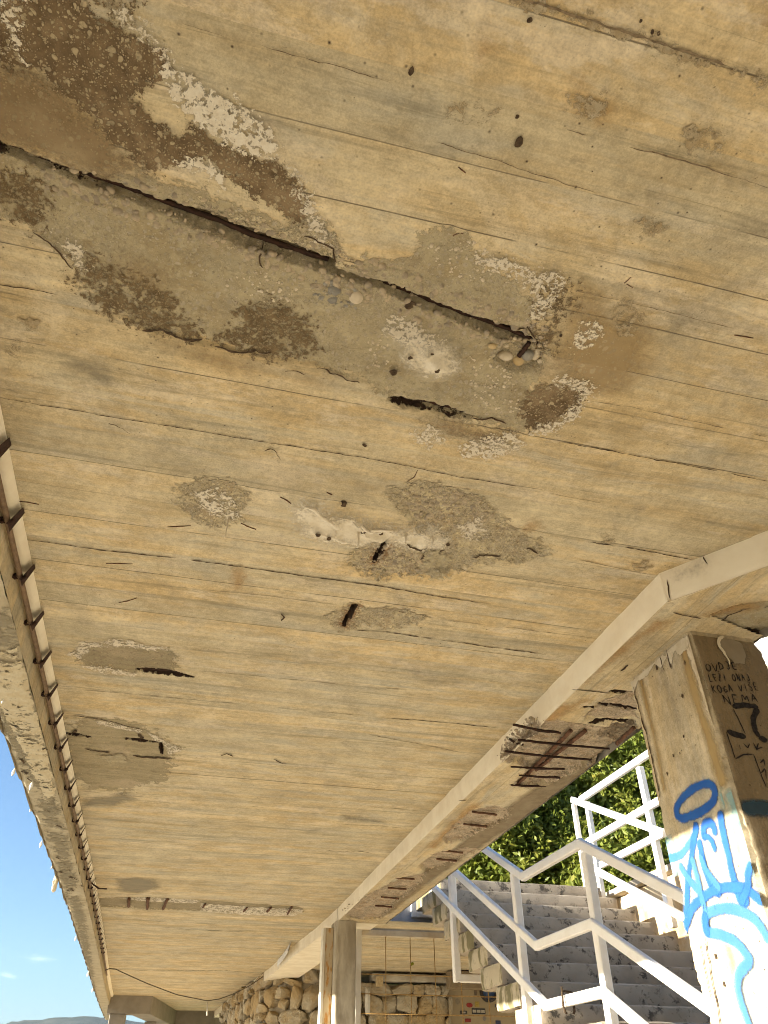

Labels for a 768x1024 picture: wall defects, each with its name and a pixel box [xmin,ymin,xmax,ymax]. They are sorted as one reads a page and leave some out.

damp [0,0,334,248]
damp [0,165,331,368]
crack [0,140,336,269]
spalling [0,145,554,433]
crack [390,396,506,424]
crack [379,280,538,343]
damp [409,254,640,461]
spalling [342,478,557,583]
spalling [323,603,428,634]
spalling [0,472,303,976]
spalling [497,635,713,789]
spalling [342,805,512,920]